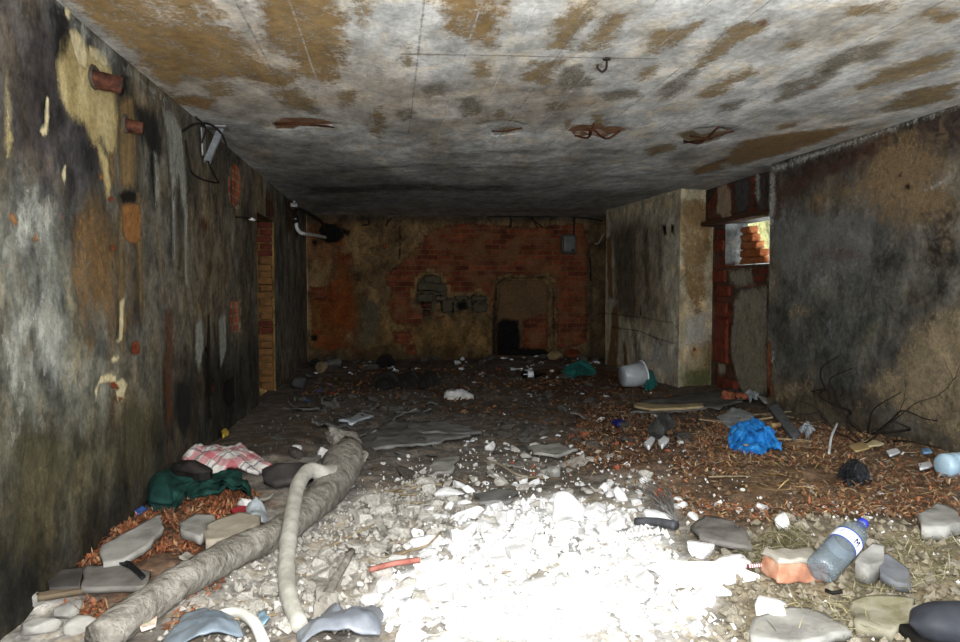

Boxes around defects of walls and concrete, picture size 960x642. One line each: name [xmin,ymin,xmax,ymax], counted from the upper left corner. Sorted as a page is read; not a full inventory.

water stain [50,8,70,55]
peeling [57,0,371,244]
spalling [458,96,525,135]
spalling [565,114,625,140]
spalling [644,126,735,157]
efflorescence [5,189,51,254]
water stain [118,97,188,354]
peeling [698,42,960,403]
spalling [415,274,488,320]
efflorescence [6,296,64,391]
efflorescence [195,321,203,367]